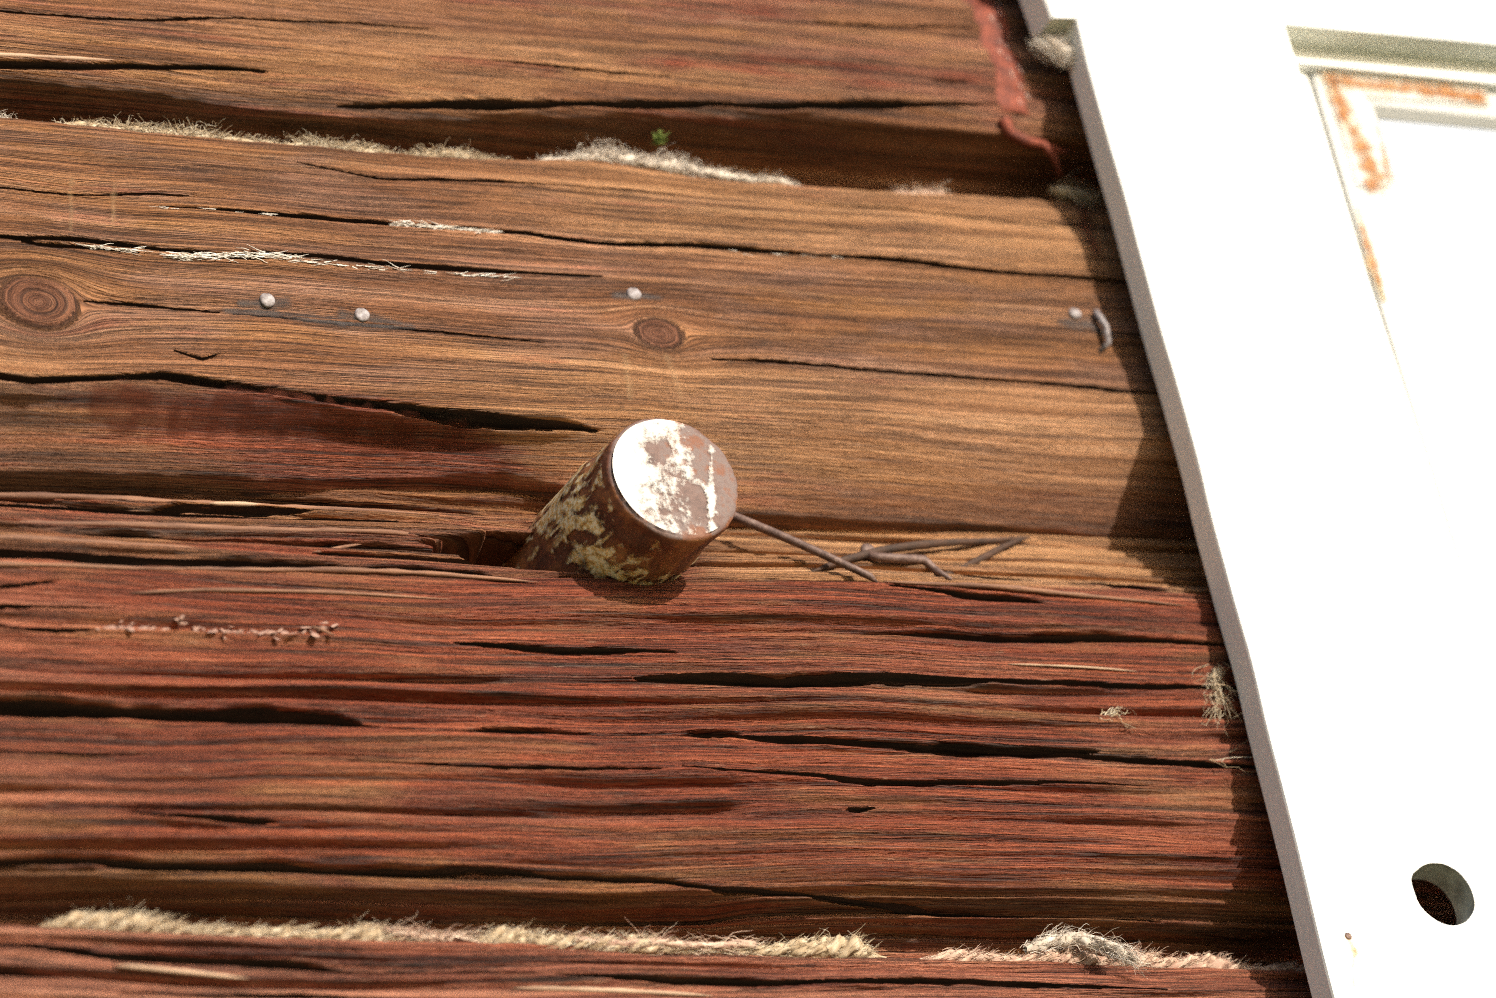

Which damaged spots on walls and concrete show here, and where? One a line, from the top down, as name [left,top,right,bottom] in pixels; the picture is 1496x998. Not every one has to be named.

crack [0,61,266,74]
rust [1325,75,1484,190]
crack [297,162,682,195]
crack [0,187,1128,284]
rust [1362,226,1384,298]
crack [83,300,541,343]
crack [0,350,598,433]
crack [711,358,1159,395]
crack [0,700,1256,813]